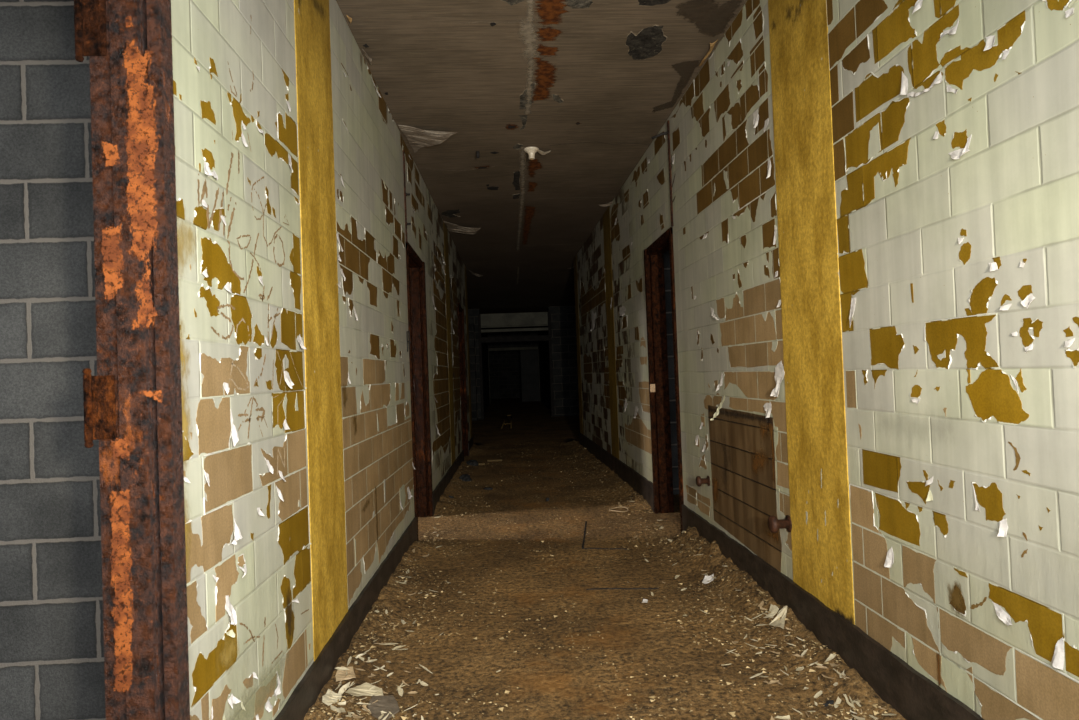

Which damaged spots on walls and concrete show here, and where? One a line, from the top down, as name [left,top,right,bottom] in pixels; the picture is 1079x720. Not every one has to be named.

rust [101,40,161,330]
peeling [194,57,218,79]
peeling [201,101,216,125]
peeling [199,140,218,180]
peeling [227,68,300,205]
peeling [364,59,394,125]
rust [532,0,569,101]
peeling [1042,0,1076,18]
peeling [336,133,461,607]
peeling [846,257,1043,425]
peeling [1063,317,1079,368]
peeling [176,198,311,720]